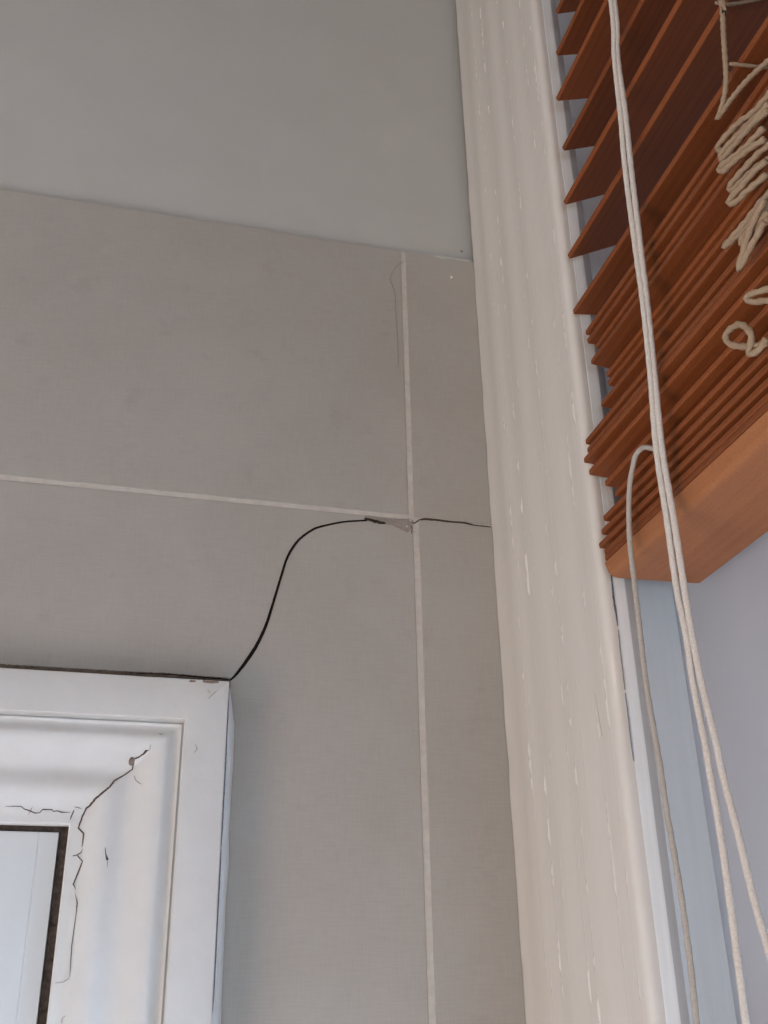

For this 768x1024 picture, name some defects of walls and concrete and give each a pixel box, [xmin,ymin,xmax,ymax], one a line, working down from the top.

crack [0,520,367,1006]
crack [410,518,491,534]